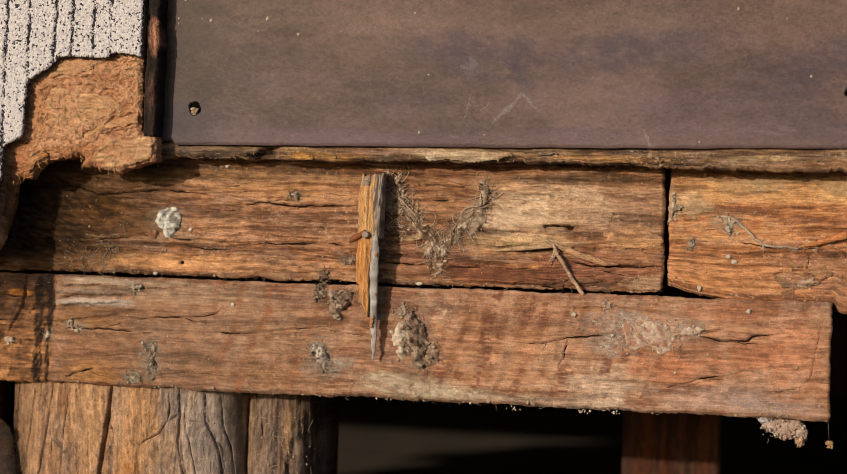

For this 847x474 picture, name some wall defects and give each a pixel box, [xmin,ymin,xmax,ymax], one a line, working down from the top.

spalling [0,0,163,250]
crack [0,278,32,345]
crack [529,334,611,357]
crack [699,332,778,345]
crack [141,372,233,474]